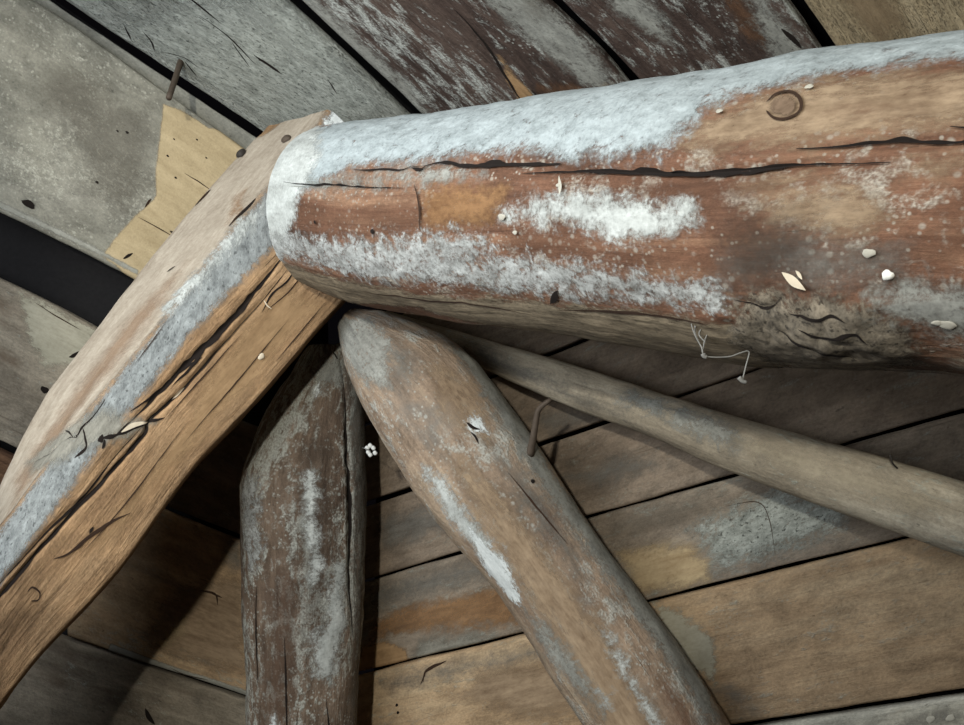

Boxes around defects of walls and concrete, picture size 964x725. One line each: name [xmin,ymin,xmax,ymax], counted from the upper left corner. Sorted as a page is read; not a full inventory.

mould [120,0,426,126]
leakage [487,0,612,93]
mould [613,0,670,45]
leakage [726,0,803,56]
leakage [82,192,273,423]
crack [0,260,324,597]
mould [0,434,109,580]
crack [201,590,222,605]
crack [145,708,155,725]